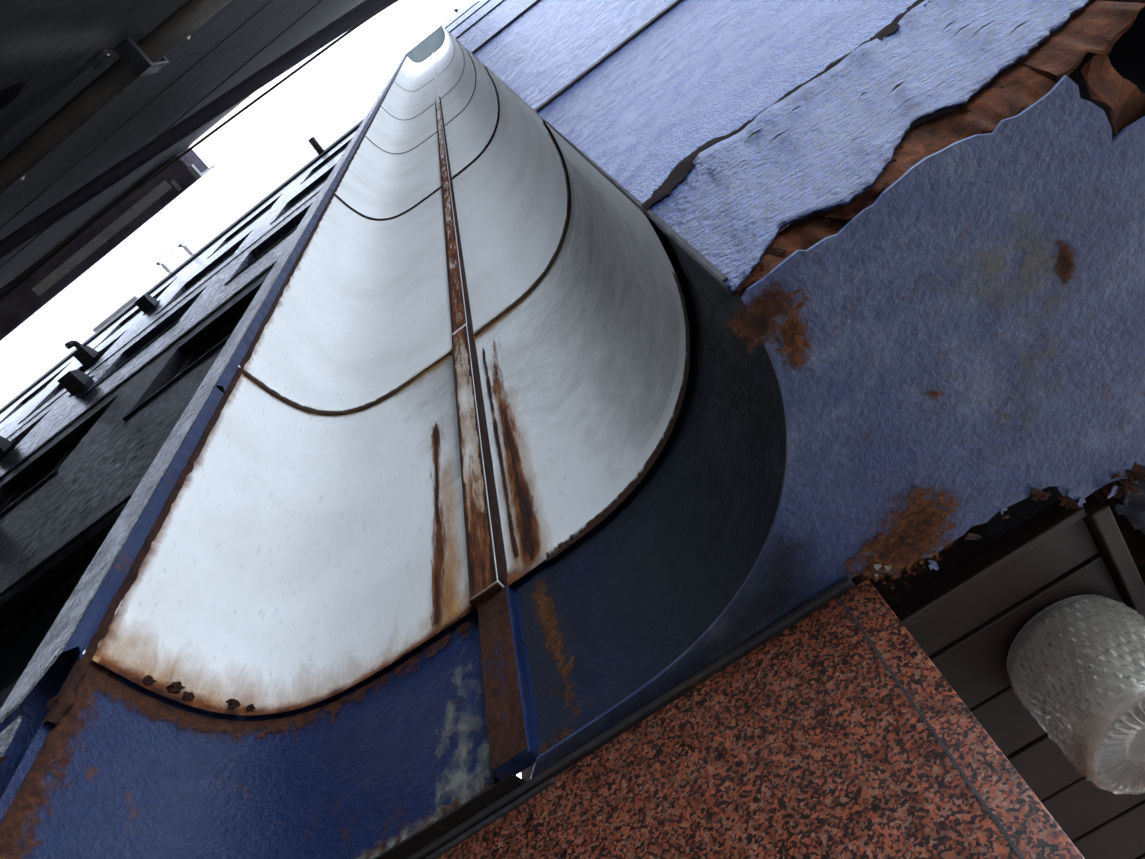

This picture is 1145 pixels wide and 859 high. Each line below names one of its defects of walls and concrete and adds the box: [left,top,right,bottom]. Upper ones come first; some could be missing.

rust [726,0,1145,370]
rust [0,56,690,859]
rust [845,477,982,588]
rust [1030,489,1086,511]
rust [1103,465,1145,499]
peeling [436,705,490,816]